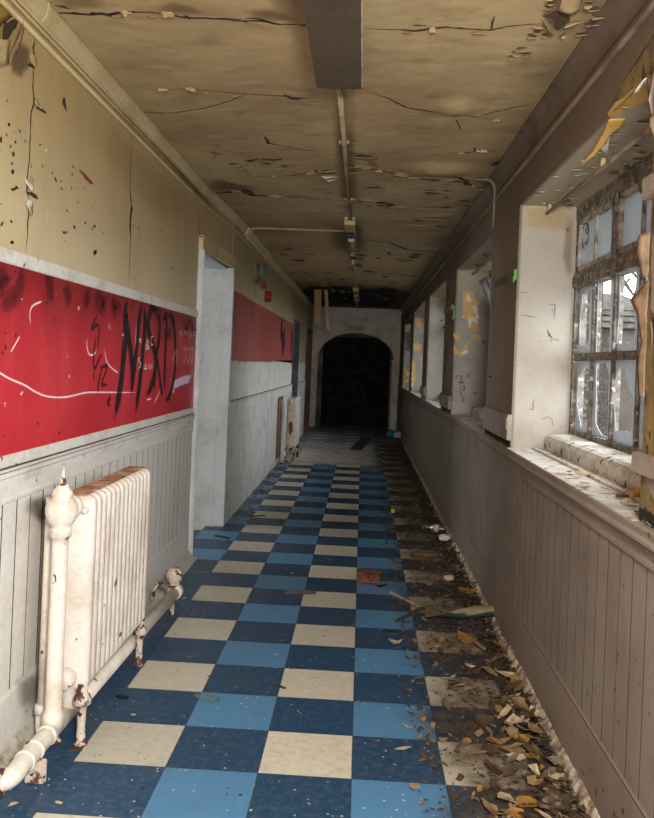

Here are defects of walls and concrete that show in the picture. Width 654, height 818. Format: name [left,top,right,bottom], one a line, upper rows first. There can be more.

crack [2,19,18,40]
peeling [0,4,24,68]
crack [54,5,307,27]
crack [378,17,547,34]
flaking render [508,0,603,60]
crack [145,87,307,113]
peeling [571,36,654,178]
crack [9,40,46,247]
crack [215,135,484,210]
peeling [453,290,486,358]
peeling [630,198,654,456]
peeling [633,475,654,526]